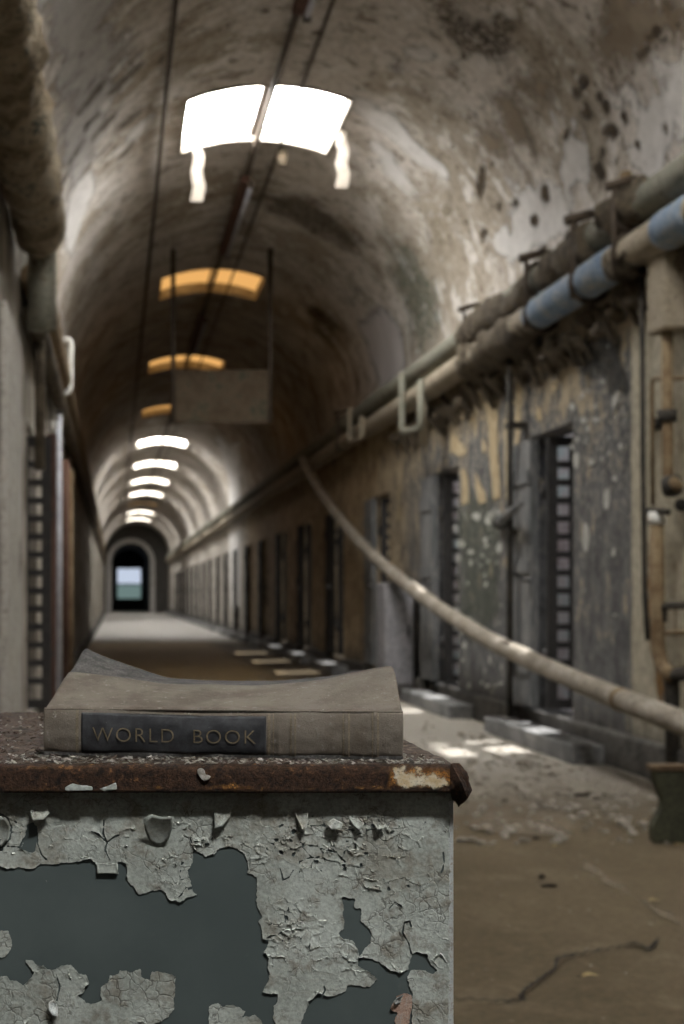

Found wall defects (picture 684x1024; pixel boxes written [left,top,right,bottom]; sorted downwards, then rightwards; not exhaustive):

peeling [352,97,448,204]
peeling [465,25,684,266]
flaking render [388,284,648,588]
crack [455,937,660,1002]